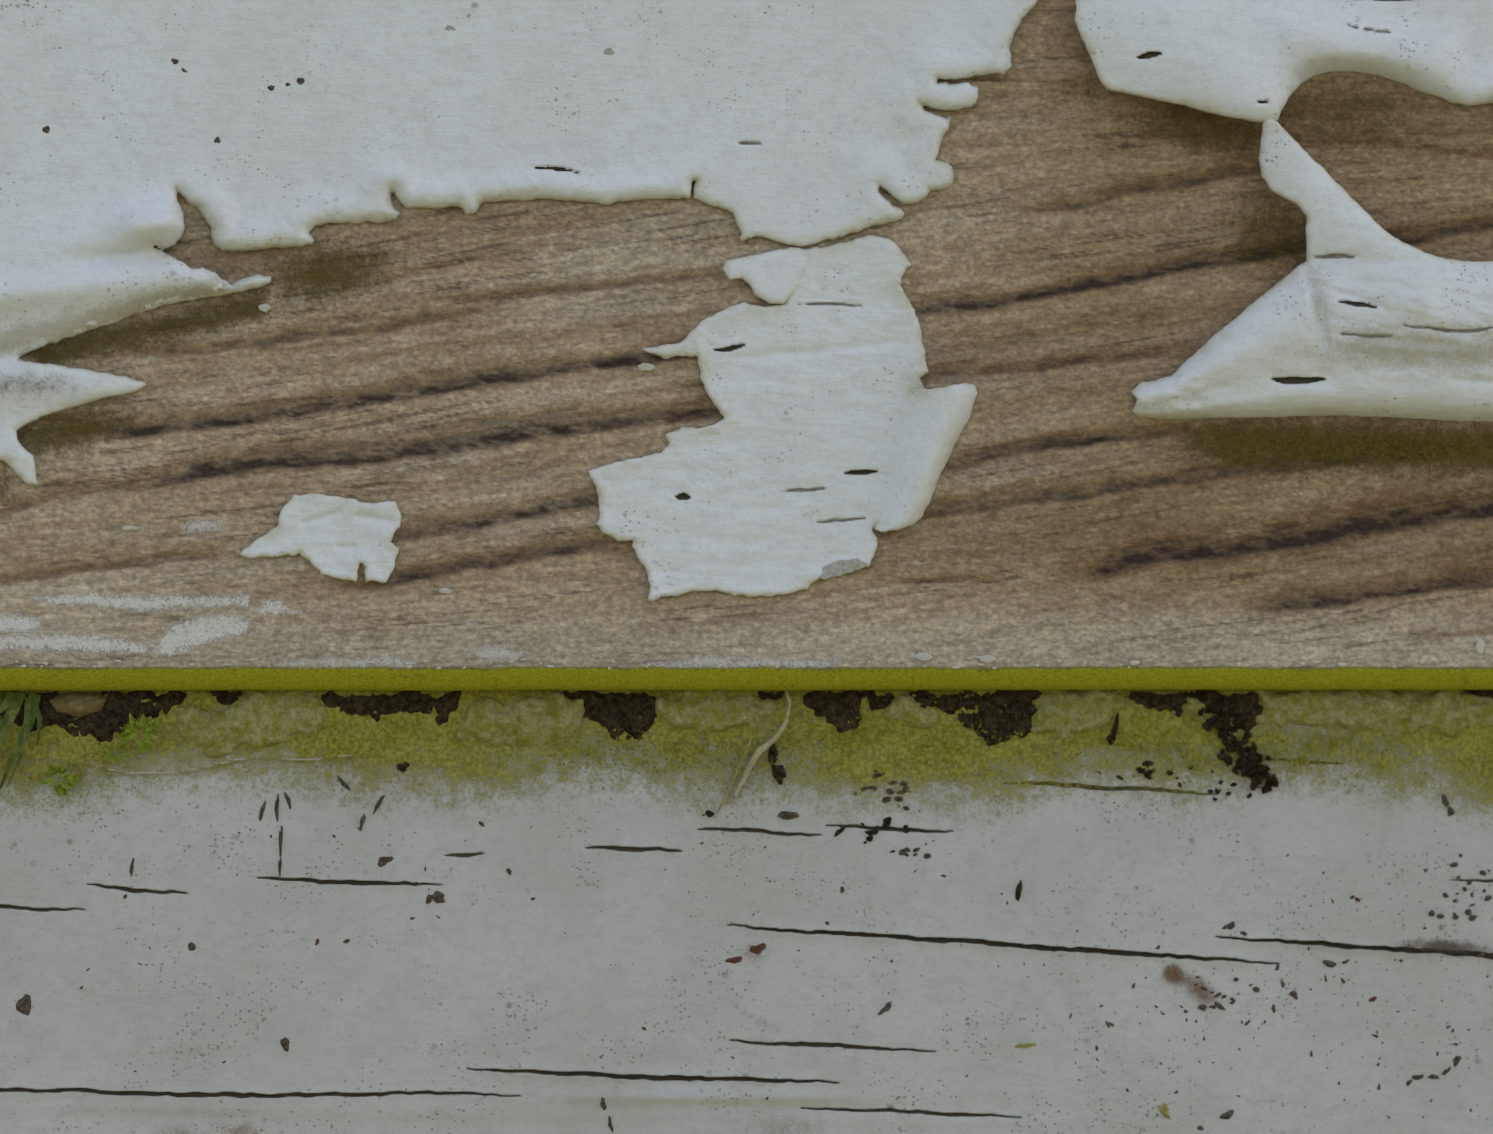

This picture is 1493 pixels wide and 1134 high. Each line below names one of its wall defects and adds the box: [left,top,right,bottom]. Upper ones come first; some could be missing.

peeling [1074,0,1493,422]
peeling [0,0,1038,601]
peeling [952,655,997,669]
crack [588,825,950,852]
crack [257,853,483,886]
crack [737,925,1493,964]
crack [0,1040,1011,1117]